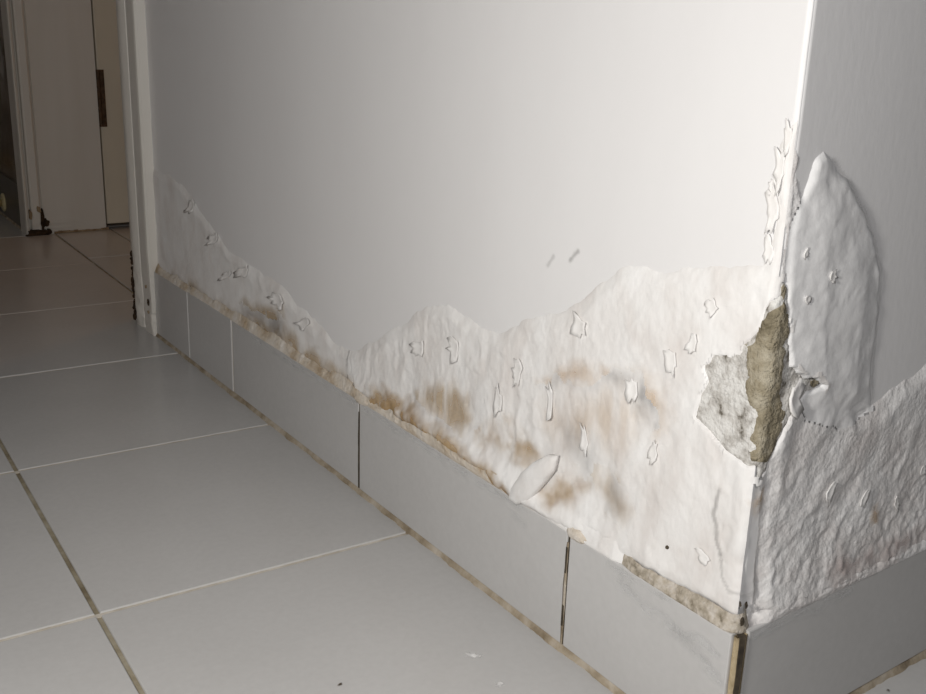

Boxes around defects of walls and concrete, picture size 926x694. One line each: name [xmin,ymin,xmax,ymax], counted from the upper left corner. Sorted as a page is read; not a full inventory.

leakage [431,392,464,421]
peeling [153,0,926,634]